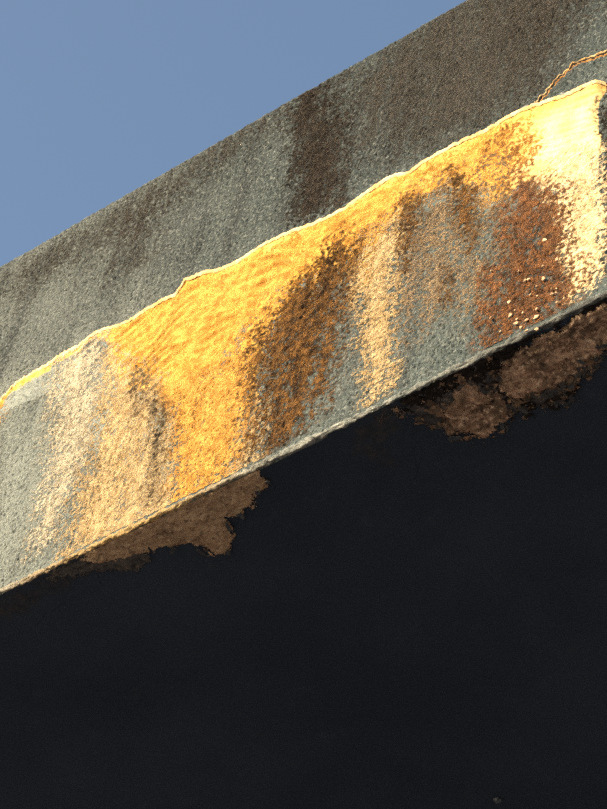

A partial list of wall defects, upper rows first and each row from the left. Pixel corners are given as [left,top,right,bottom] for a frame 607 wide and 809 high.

crack [522,50,607,108]
rust [54,108,593,560]
peeling [373,303,607,444]
peeling [44,470,271,582]